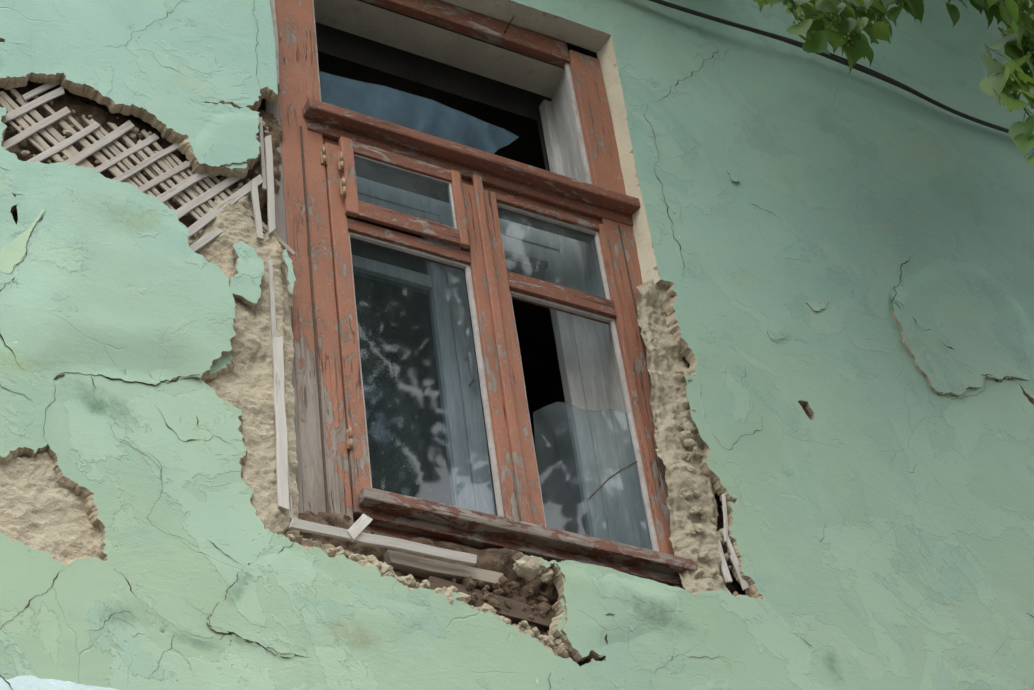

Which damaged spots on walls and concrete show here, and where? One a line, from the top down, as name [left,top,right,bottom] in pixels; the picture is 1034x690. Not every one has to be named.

crack [0,277,228,443]
spalling [0,81,569,658]
spalling [637,279,749,596]
crack [937,374,1019,399]